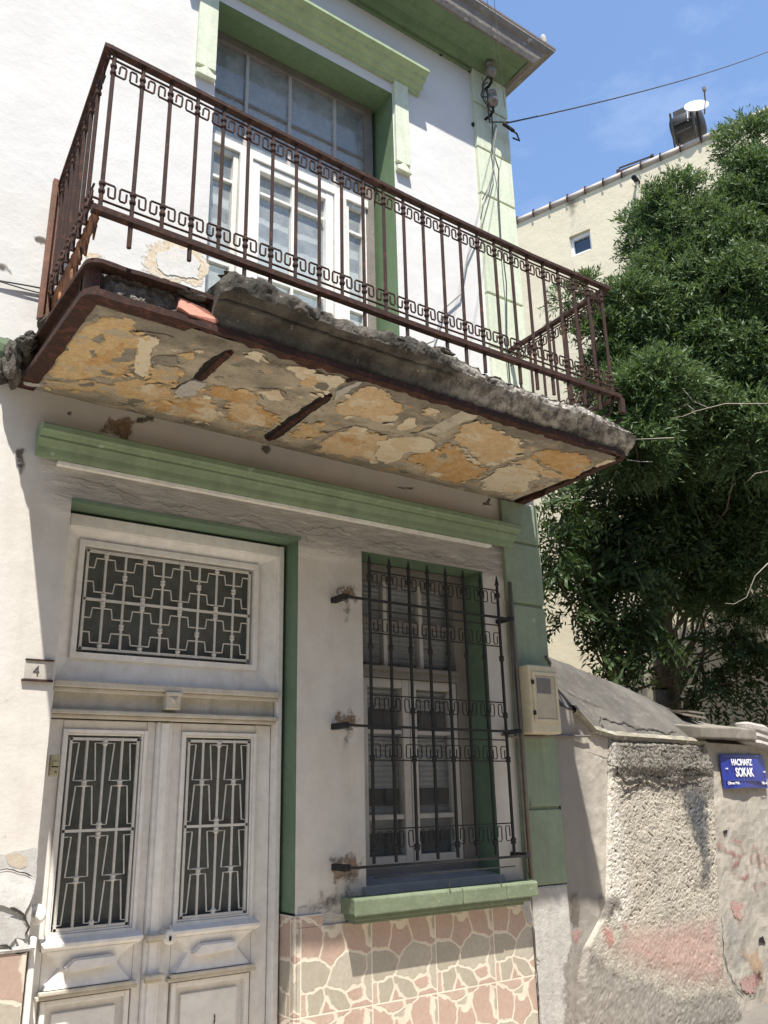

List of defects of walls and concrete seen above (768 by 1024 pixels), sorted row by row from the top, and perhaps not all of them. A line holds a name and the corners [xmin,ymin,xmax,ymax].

peeling [141,240,210,287]
flaking render [176,297,218,332]
peeling [0,315,616,494]
rust [101,417,154,440]